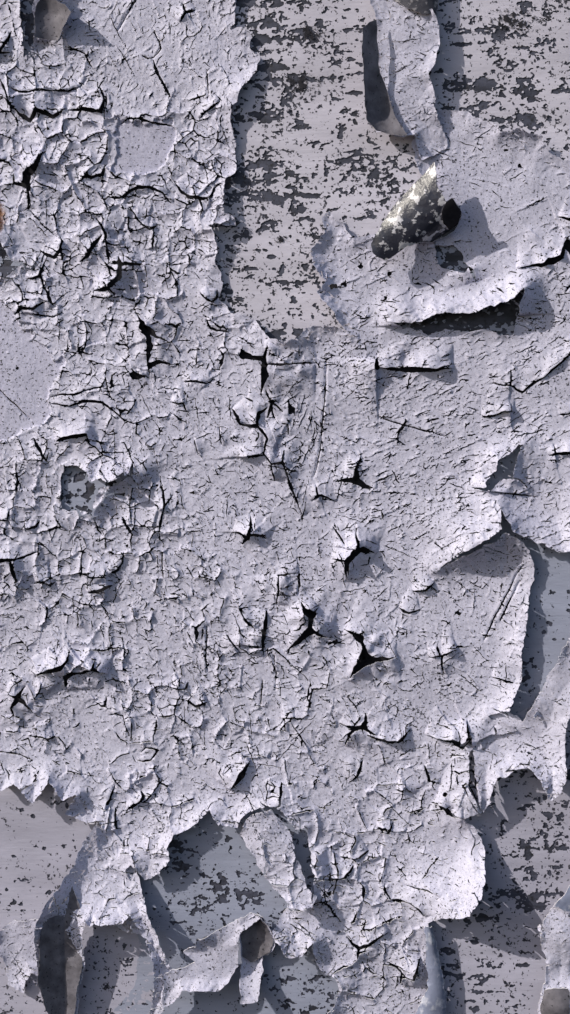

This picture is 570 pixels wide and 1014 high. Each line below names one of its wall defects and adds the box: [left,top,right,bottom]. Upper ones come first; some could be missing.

peeling [0,0,71,72]
crack [0,30,173,127]
peeling [0,226,39,295]
crack [15,165,222,318]
peeling [197,0,570,357]
crack [134,291,377,515]
crack [0,372,173,590]
peeling [48,454,142,530]
crack [173,572,397,708]
crack [340,713,478,816]
peeling [416,427,570,1014]
peeling [0,763,352,1014]